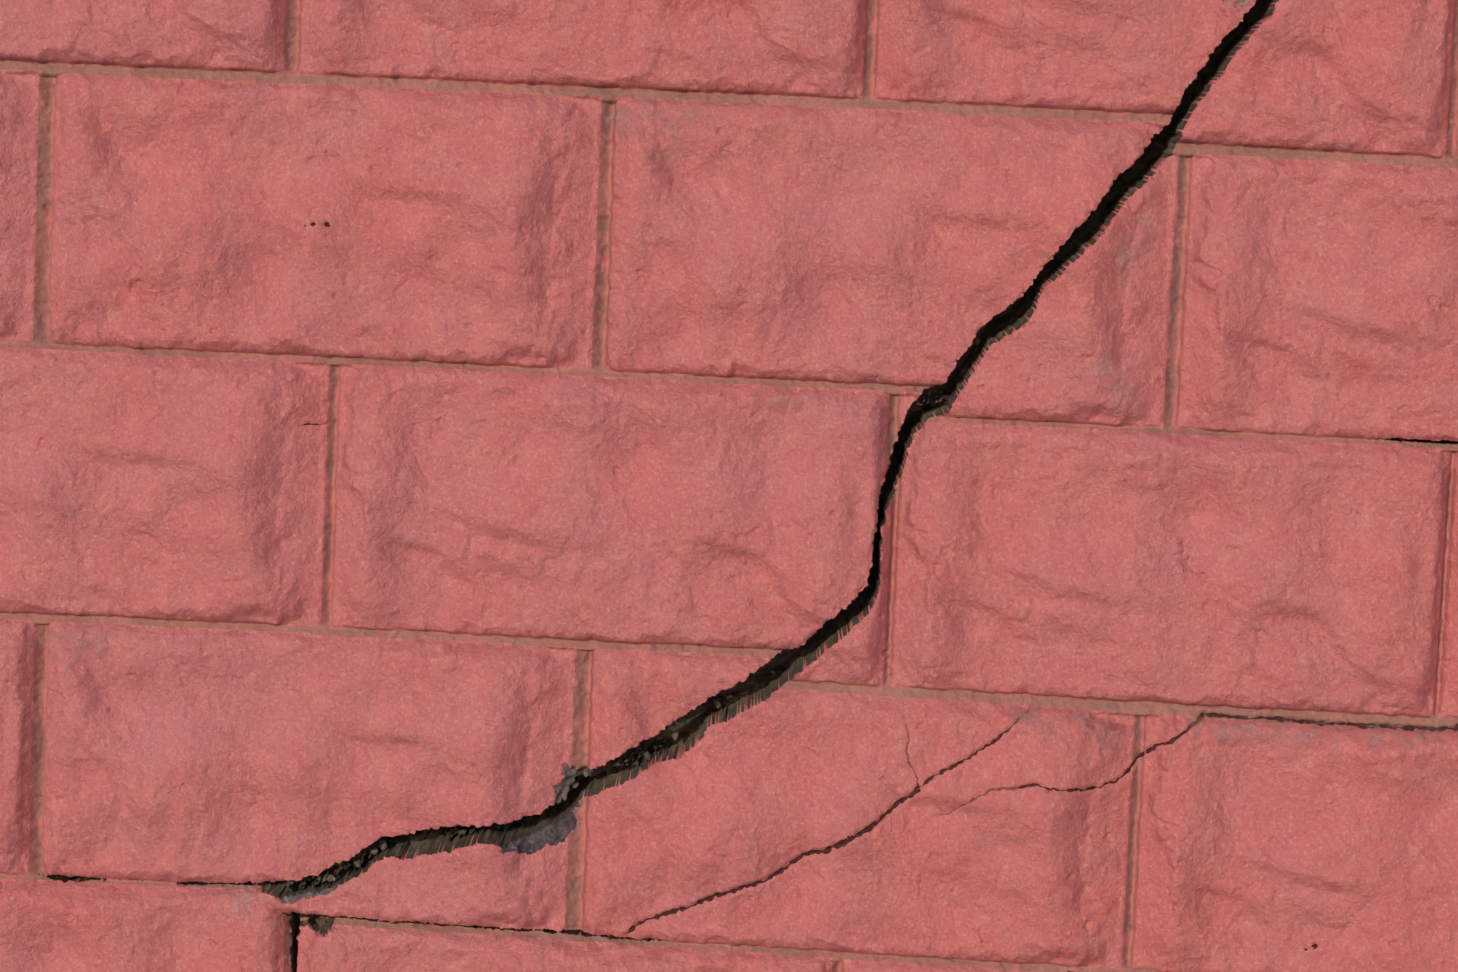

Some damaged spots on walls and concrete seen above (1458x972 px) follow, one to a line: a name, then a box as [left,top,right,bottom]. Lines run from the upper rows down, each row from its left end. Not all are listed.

crack [179,0,1279,972]
spalling [501,763,597,854]
crack [937,713,1458,817]
crack [38,874,106,883]